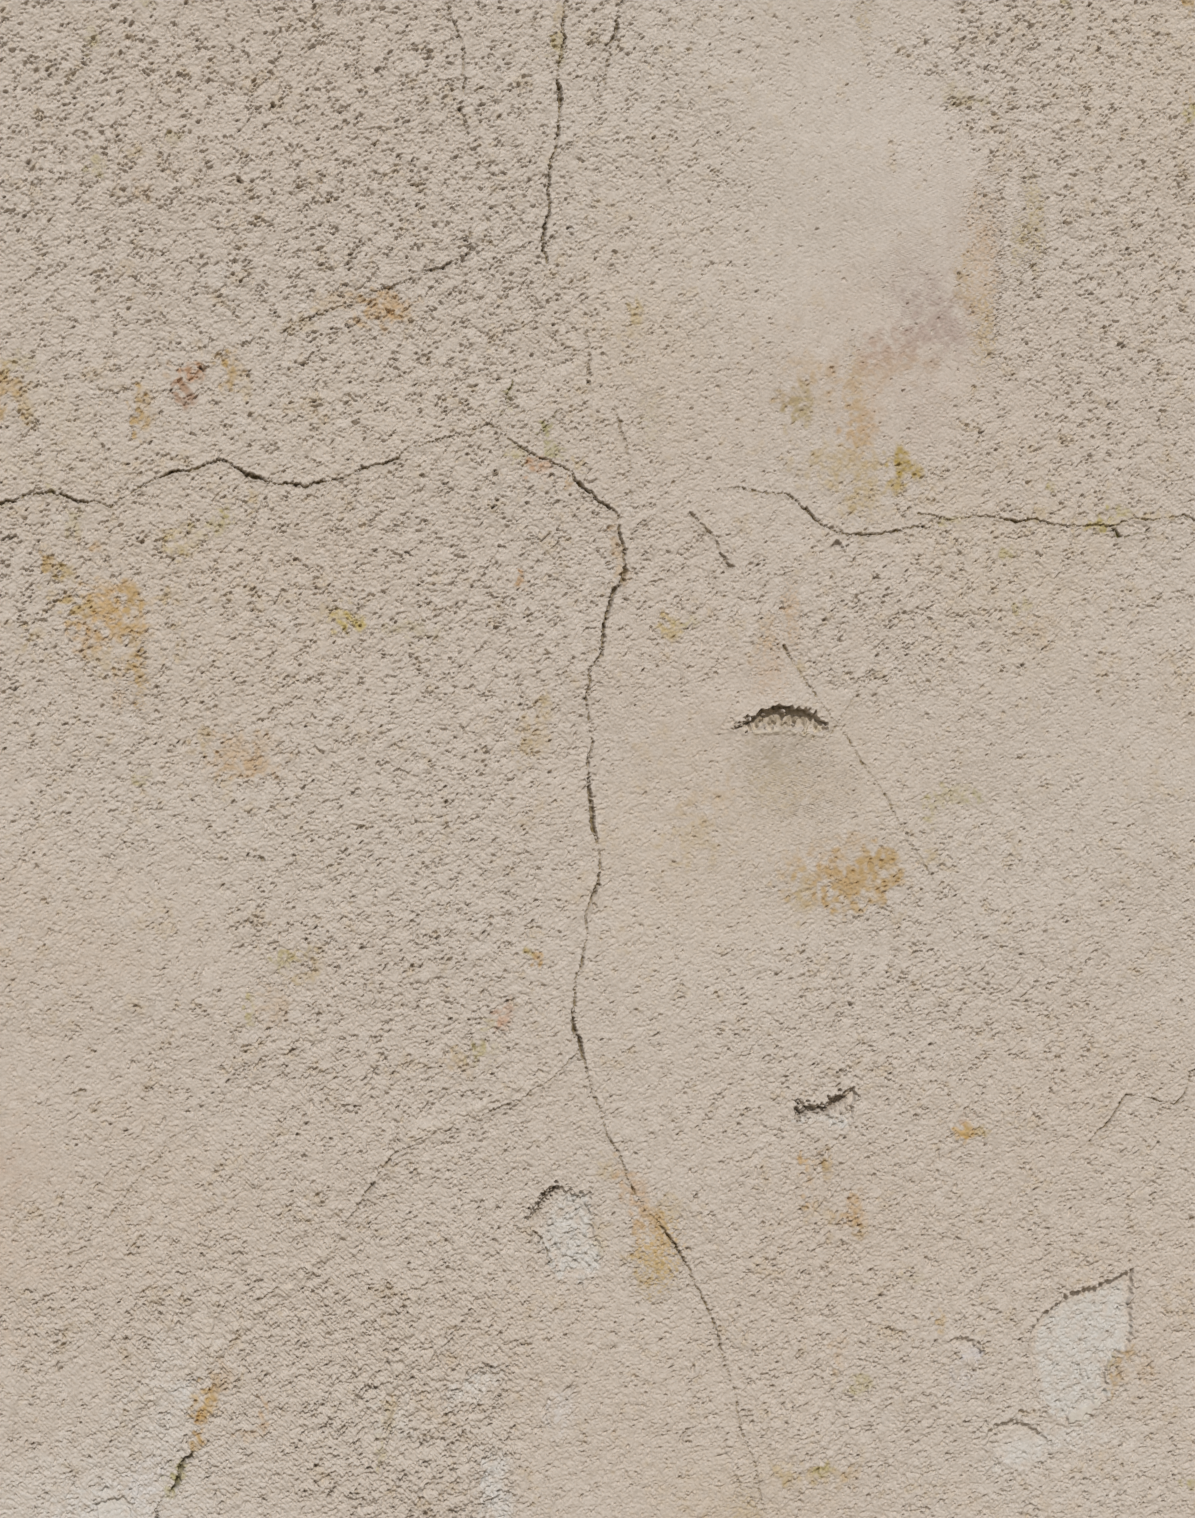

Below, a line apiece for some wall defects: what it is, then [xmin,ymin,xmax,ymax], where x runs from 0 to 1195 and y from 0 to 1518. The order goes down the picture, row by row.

crack [445,0,470,141]
crack [540,0,626,265]
crack [280,216,474,336]
crack [0,330,1195,1518]
flaking render [790,1068,861,1134]
flaking render [524,1180,603,1280]
flaking render [1027,1269,1134,1426]
flaking render [984,1419,1054,1470]